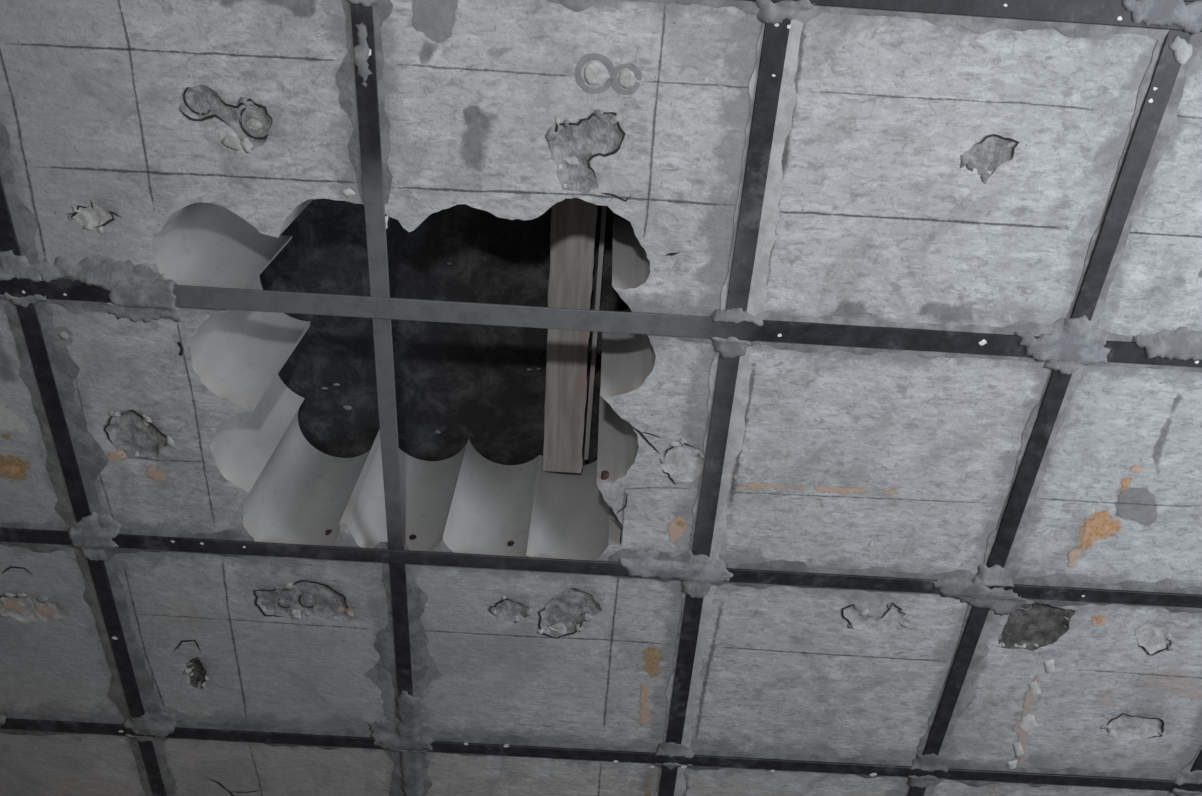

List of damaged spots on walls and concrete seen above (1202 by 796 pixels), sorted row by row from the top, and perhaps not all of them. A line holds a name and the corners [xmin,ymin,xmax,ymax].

spalling [179,84,272,154]
spalling [545,109,625,193]
spalling [960,134,1019,184]
rust [0,454,30,481]
rust [1068,510,1122,568]
spalling [254,580,354,622]
spalling [489,588,602,639]
spalling [999,603,1076,651]
rust [638,647,662,726]
spalling [1100,713,1164,740]